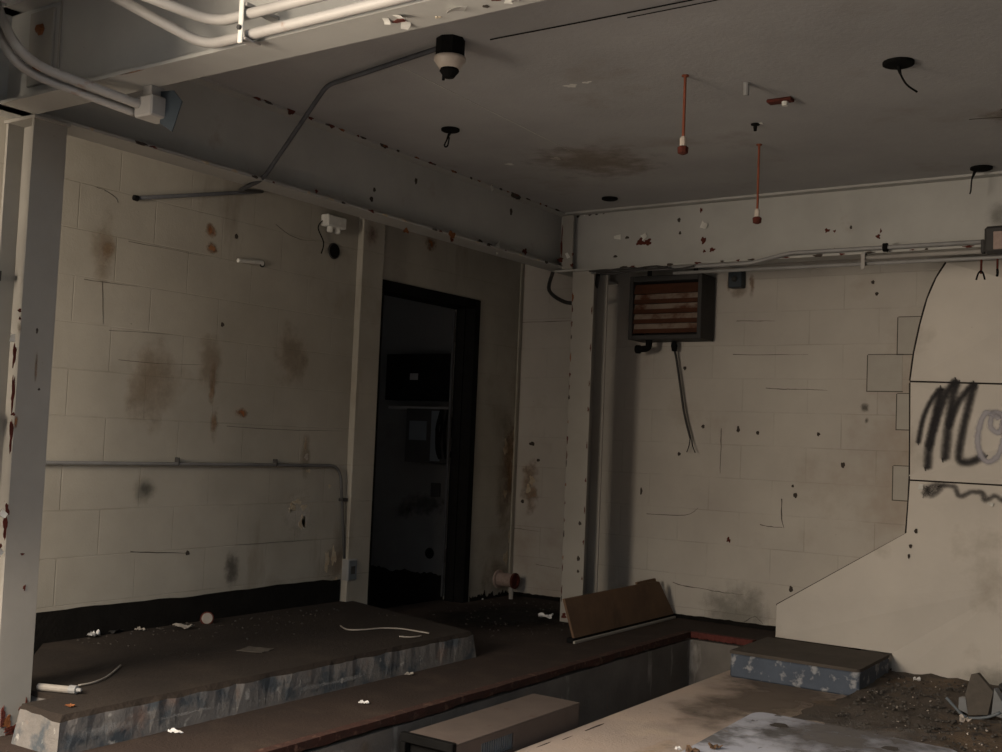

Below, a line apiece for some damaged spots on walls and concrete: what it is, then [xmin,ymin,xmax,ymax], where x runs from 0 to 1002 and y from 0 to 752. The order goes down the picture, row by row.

corrosion [9,326,20,454]
corrosion [0,503,10,556]
corrosion [0,706,16,735]